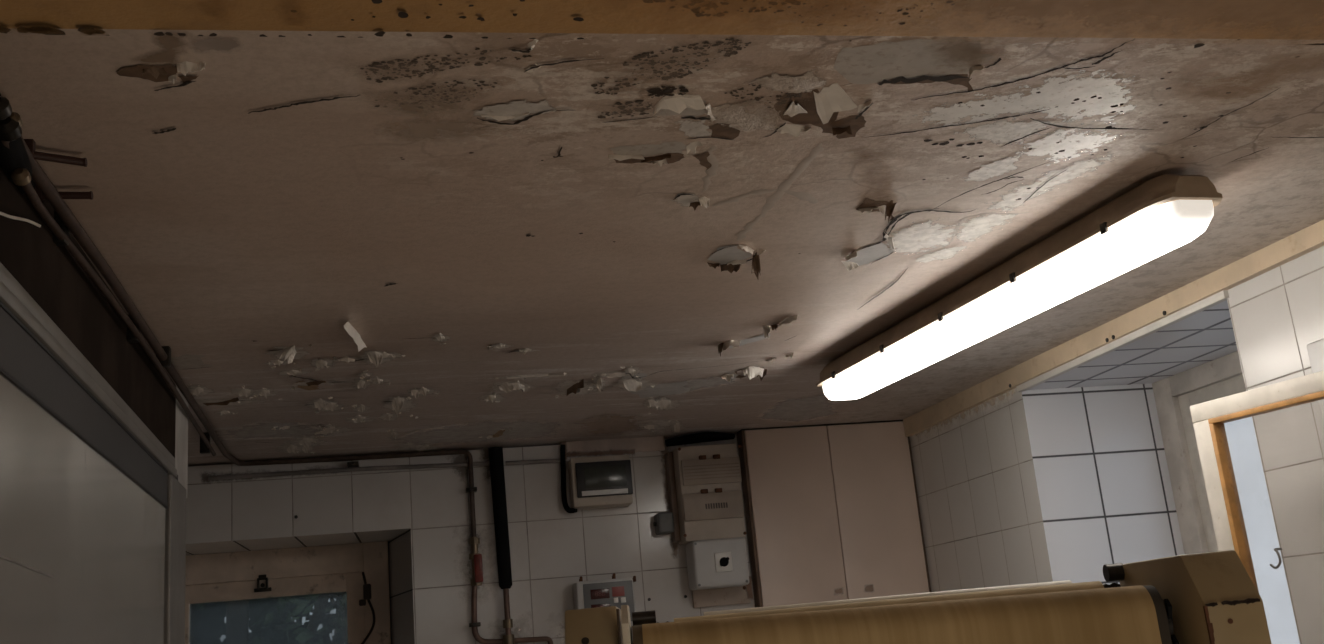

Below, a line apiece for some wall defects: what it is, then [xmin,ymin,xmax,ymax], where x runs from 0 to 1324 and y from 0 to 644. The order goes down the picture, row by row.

leakage [0,25,110,36]
leakage [897,0,1324,58]
leakage [360,34,532,109]
peeling [602,93,740,210]
leakage [591,38,752,119]
peeling [765,37,1154,310]
crack [915,38,1135,100]
crack [1183,87,1281,139]
crack [1234,137,1324,161]
peeling [707,214,766,279]
peeling [265,322,405,413]
peeling [476,315,798,414]